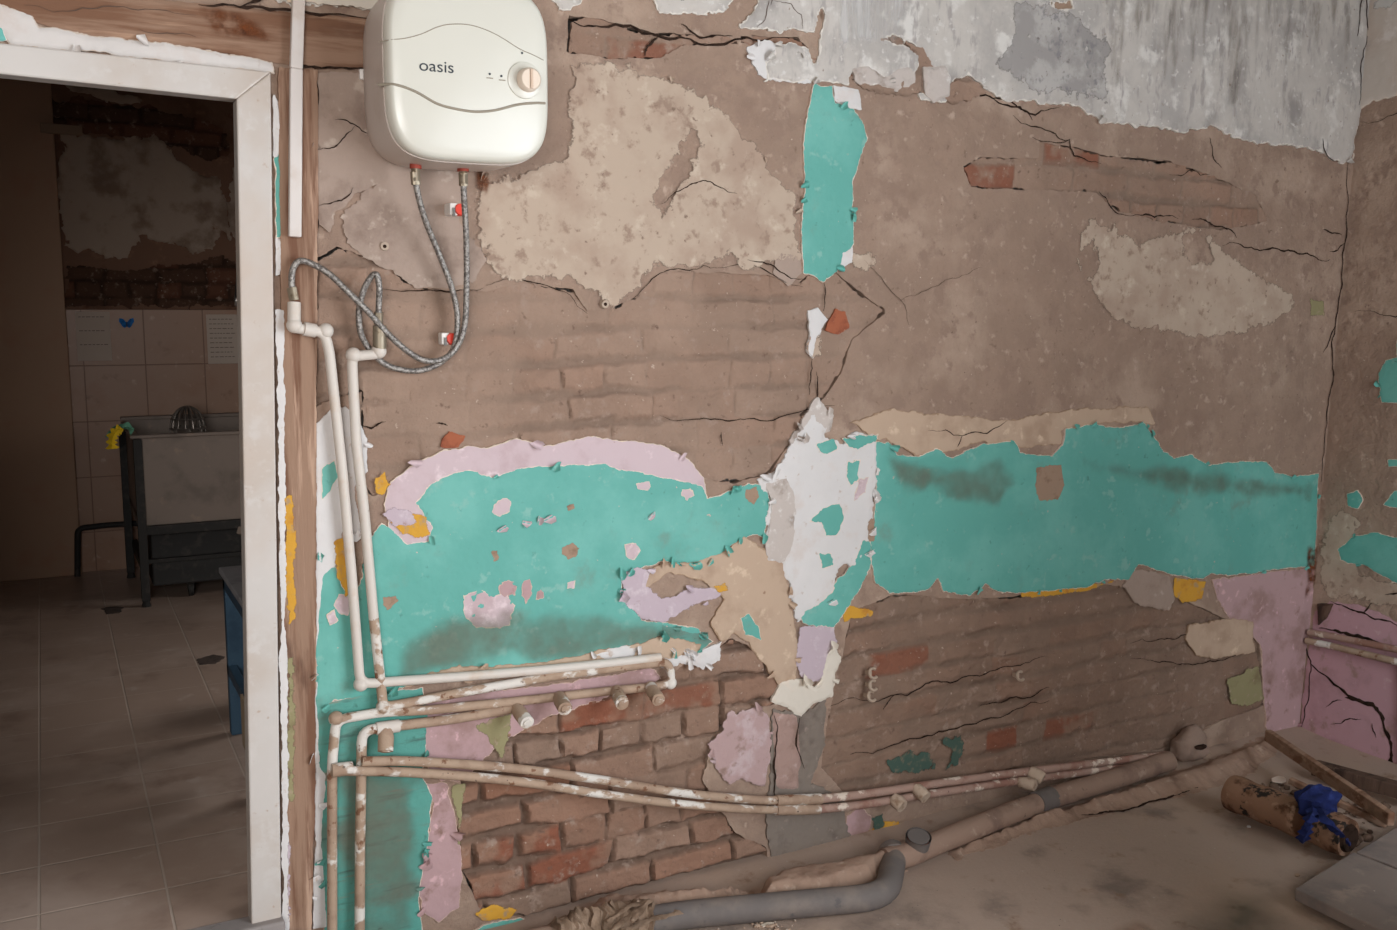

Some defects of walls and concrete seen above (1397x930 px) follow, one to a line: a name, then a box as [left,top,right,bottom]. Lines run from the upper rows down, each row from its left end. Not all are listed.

peeling [0,4,275,75]
peeling [276,0,378,11]
crack [568,0,803,57]
crack [1357,0,1397,123]
flaking render [52,85,236,310]
peeling [272,95,281,276]
crack [980,94,1397,481]
flaking render [310,0,1397,930]
crack [1301,593,1397,763]